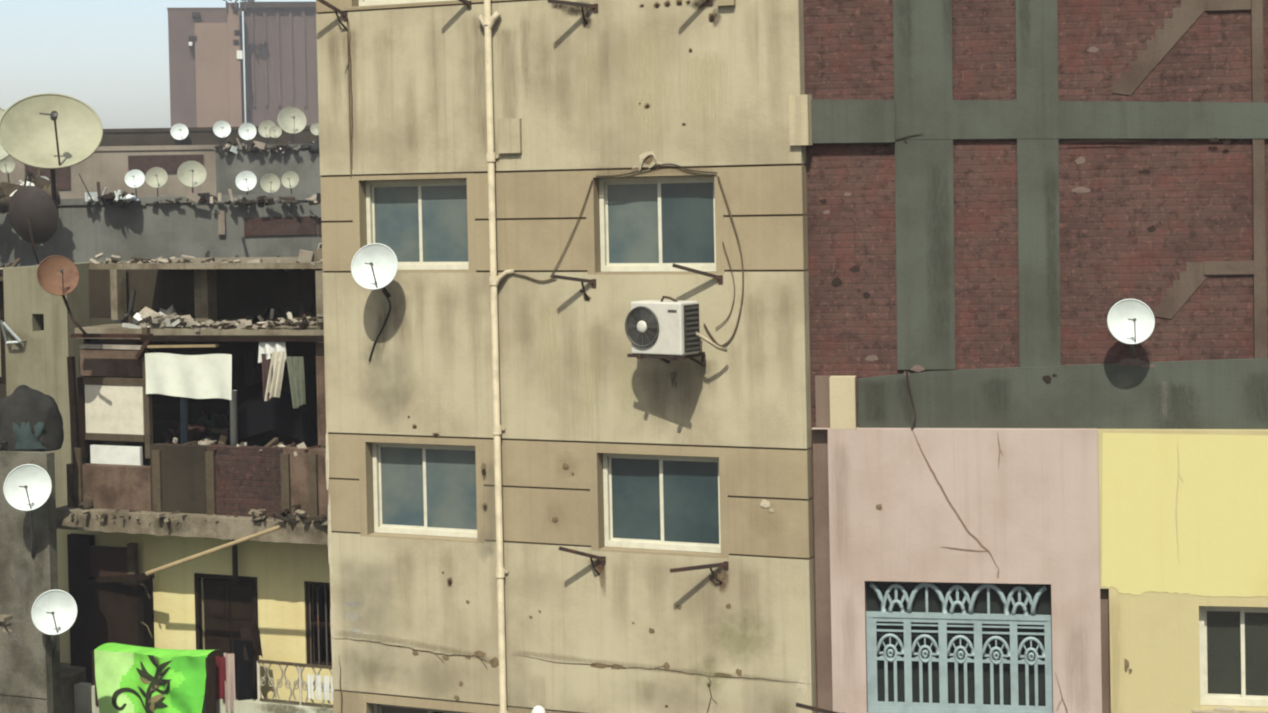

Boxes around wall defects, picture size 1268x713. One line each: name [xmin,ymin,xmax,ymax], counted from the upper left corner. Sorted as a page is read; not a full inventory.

crack [912,430,999,578]
crack [334,638,813,713]